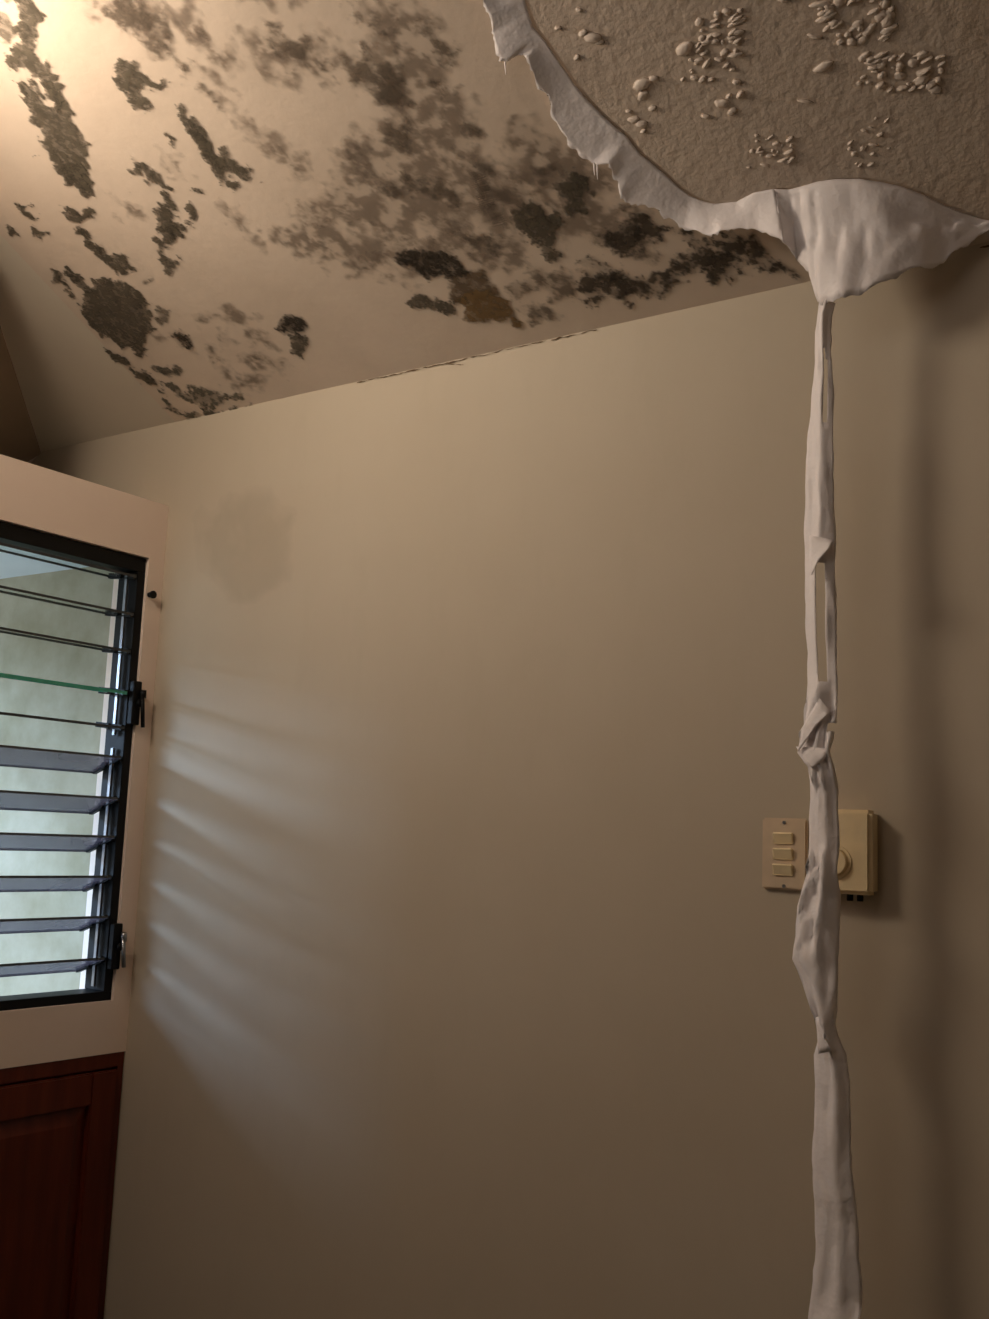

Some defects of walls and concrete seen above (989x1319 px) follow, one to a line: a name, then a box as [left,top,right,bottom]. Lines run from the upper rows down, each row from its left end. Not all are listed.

damp [102,0,230,102]
damp [253,22,325,74]
damp [286,13,799,326]
damp [274,314,308,359]
peeling [483,0,989,1319]